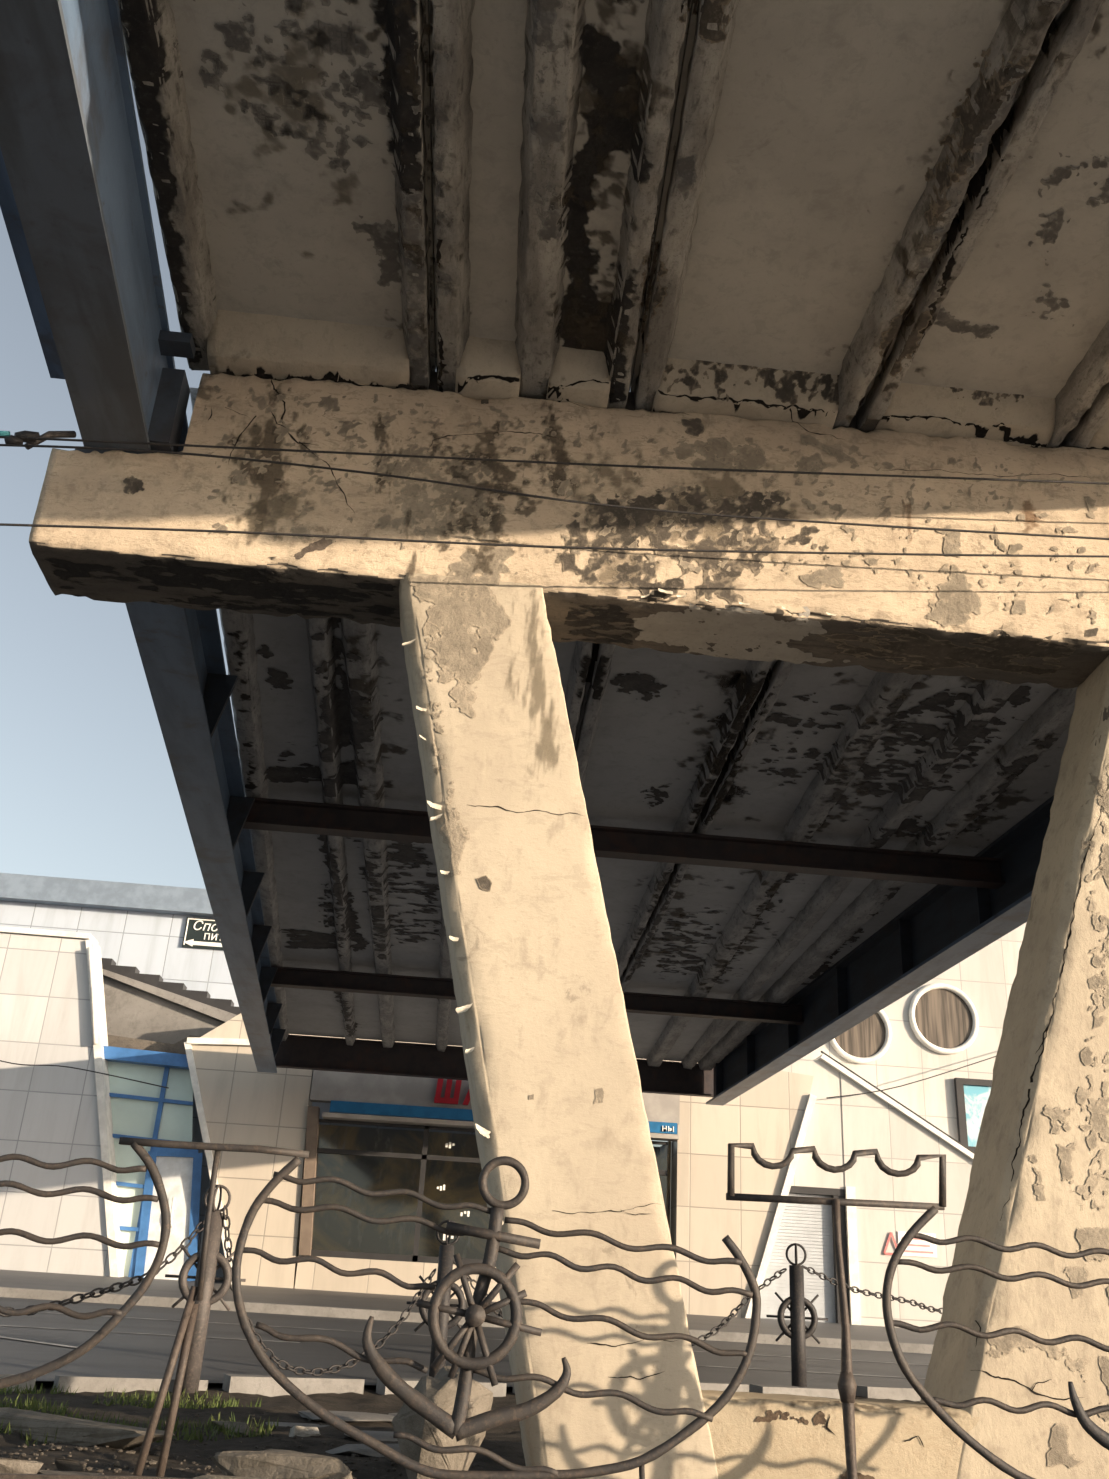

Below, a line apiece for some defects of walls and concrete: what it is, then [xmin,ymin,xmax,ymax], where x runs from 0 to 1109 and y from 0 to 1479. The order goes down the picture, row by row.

crack [1041,14,1058,58]
crack [642,206,1109,478]
crack [919,103,1014,344]
peeling [199,0,1109,960]
crack [470,805,583,816]
crack [1000,782,1109,1220]